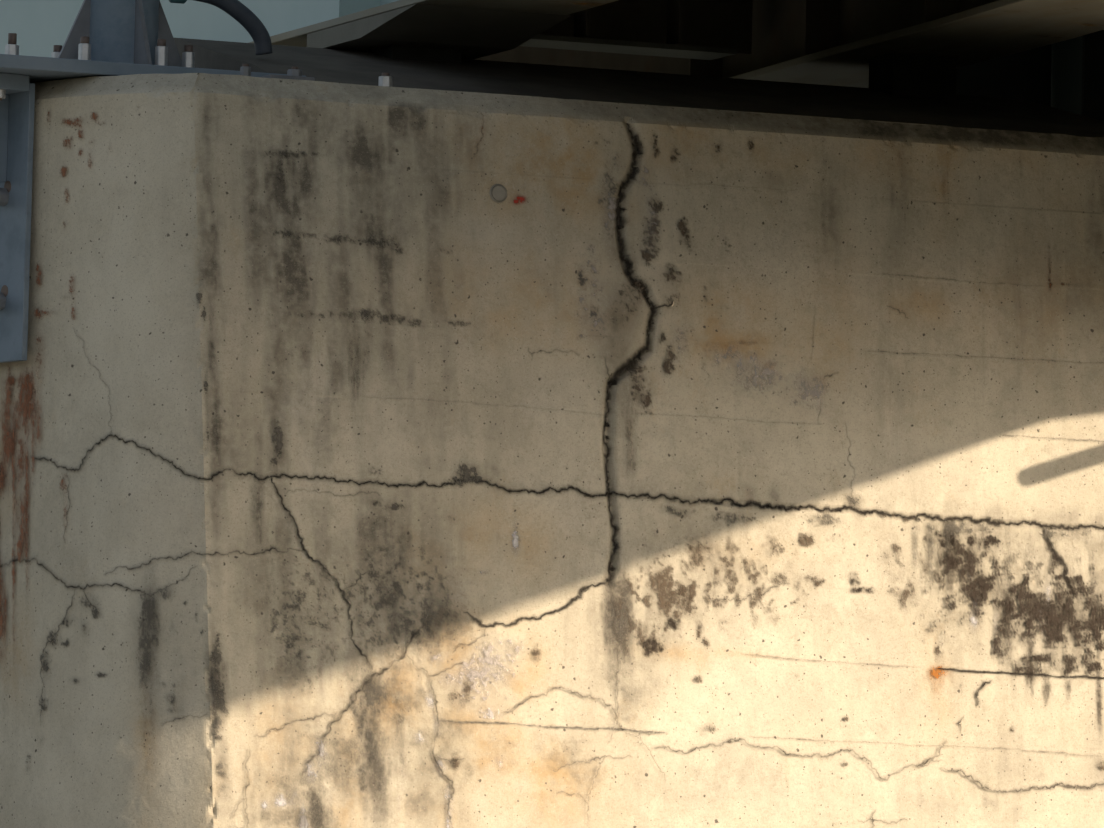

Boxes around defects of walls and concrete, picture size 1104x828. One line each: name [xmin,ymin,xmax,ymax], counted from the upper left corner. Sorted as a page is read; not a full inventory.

damp [361,309,421,326]
rust [0,368,40,638]
crack [0,123,1104,768]
mould [606,542,787,657]
mould [799,533,814,547]
damp [915,522,1104,723]
crack [431,670,454,825]
crack [918,747,1103,792]